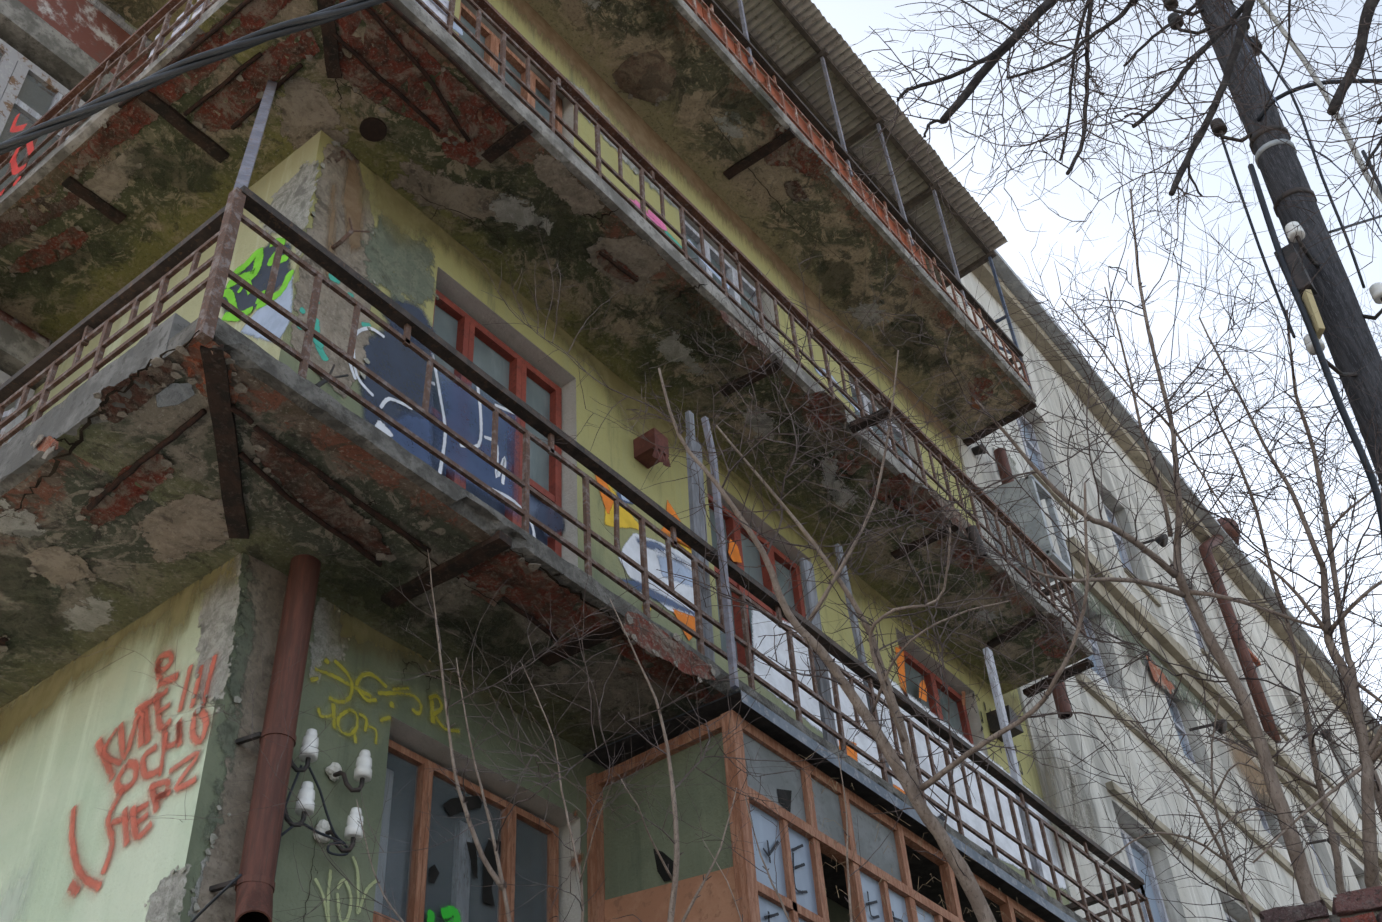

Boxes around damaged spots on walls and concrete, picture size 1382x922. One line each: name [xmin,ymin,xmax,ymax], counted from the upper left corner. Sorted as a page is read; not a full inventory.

crack [0,330,200,518]
spalling [0,0,375,284]
spalling [75,340,431,567]
peeling [290,244,372,398]
spalling [332,0,518,221]
water stain [507,0,957,451]
peeling [19,545,97,590]
peeling [144,554,288,922]
peeling [309,597,350,684]